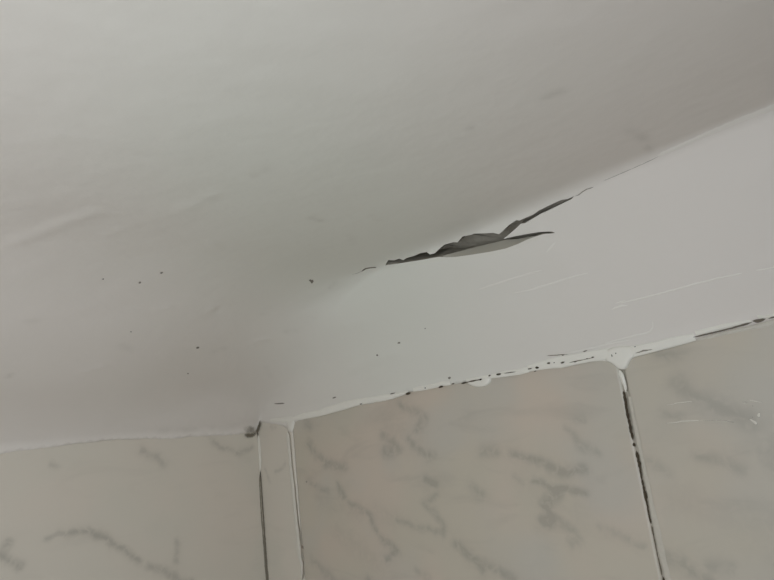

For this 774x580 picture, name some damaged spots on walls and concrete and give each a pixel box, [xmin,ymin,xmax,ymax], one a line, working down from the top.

crack [361,187,593,272]